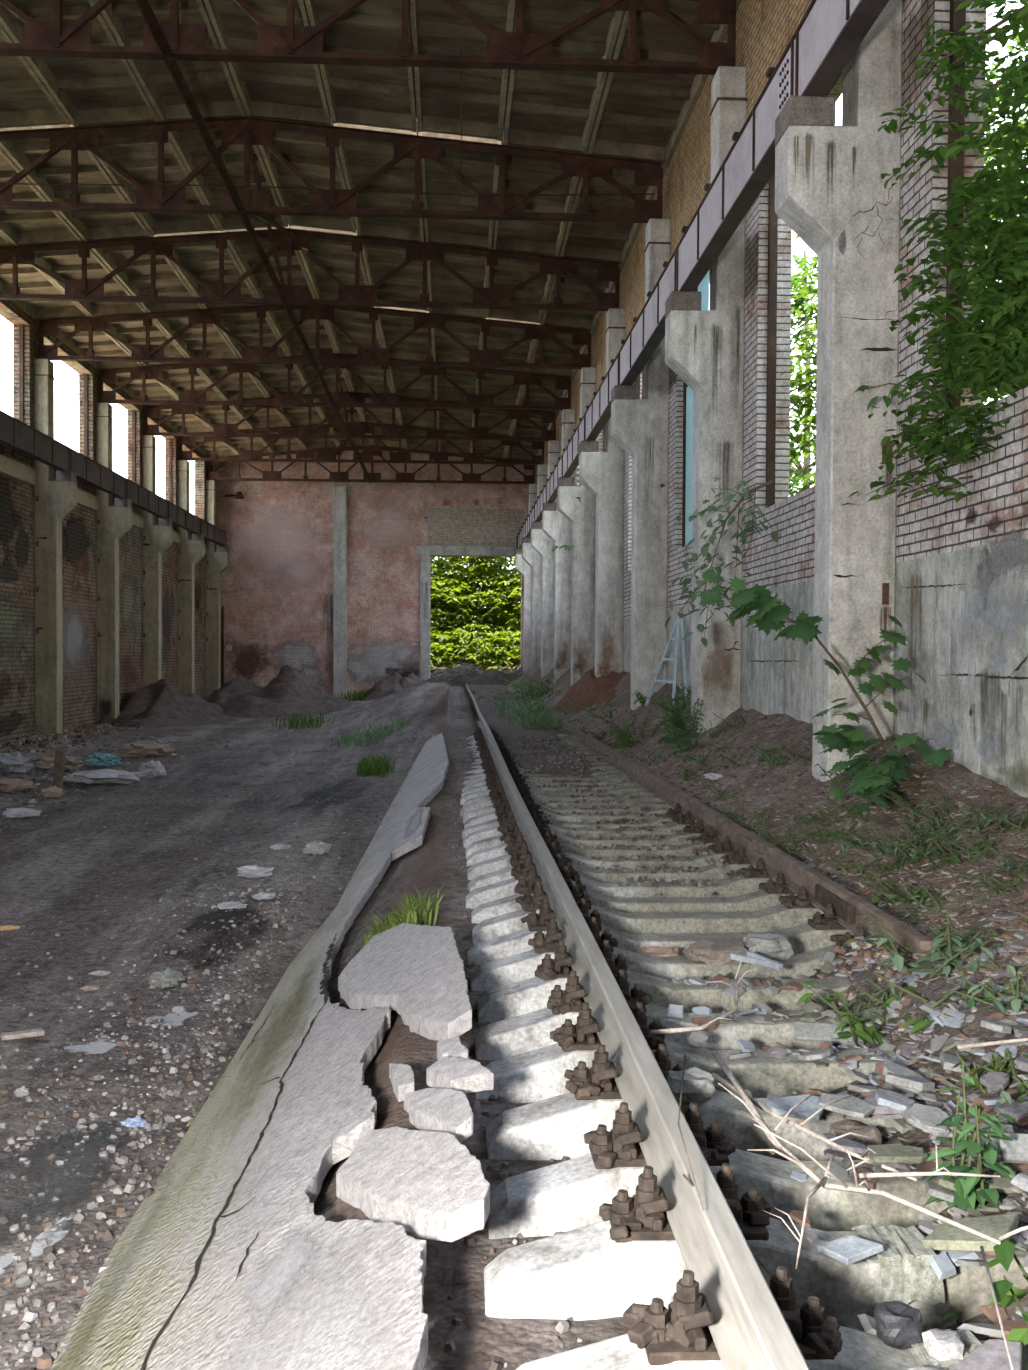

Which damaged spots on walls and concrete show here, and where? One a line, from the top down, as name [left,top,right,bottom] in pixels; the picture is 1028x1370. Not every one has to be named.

water stain [794,135,834,183]
crack [850,186,896,258]
water stain [162,590,173,658]
crack [937,655,1028,699]
crack [140,933,337,1370]